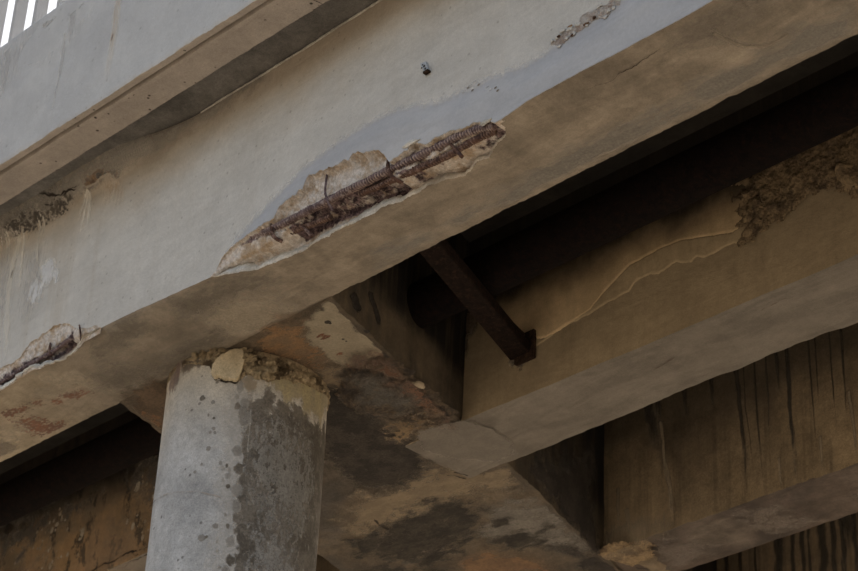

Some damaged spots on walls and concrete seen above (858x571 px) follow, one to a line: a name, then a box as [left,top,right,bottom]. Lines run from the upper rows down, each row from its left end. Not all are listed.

peeling [550,0,620,48]
crack [40,185,78,206]
water stain [0,125,182,343]
spalling [209,118,506,278]
peeling [495,126,858,346]
spalling [0,323,101,391]
peeling [211,348,245,384]
water stain [324,386,433,488]
water stain [733,348,795,472]
crack [92,547,147,571]
water stain [342,444,719,571]
water stain [743,505,858,571]